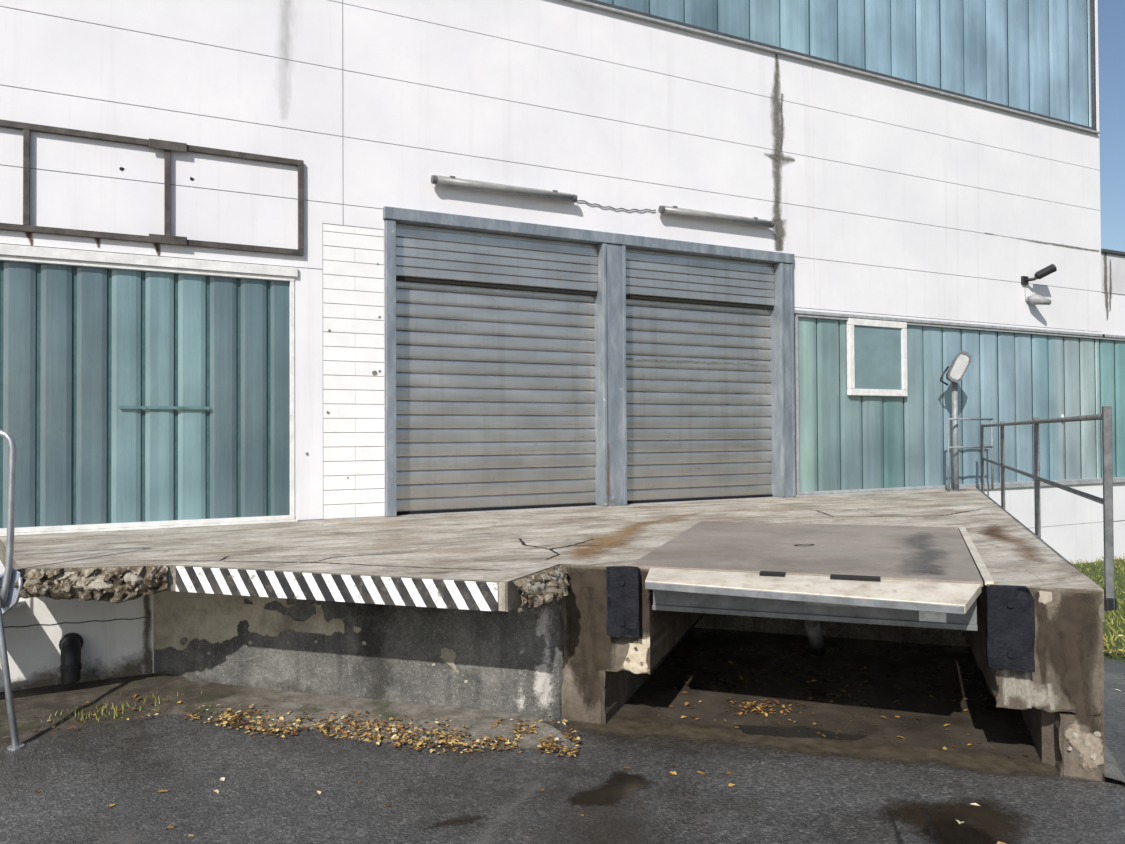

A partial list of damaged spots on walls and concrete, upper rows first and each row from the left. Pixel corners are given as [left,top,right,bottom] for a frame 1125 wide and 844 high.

flaking render [13,566,366,655]
leakage [358,604,388,699]
leakage [516,607,554,710]
spalling [512,565,569,613]
leakage [566,567,619,706]
spalling [623,637,650,674]
leakage [641,571,650,633]
leakage [1003,592,1100,732]
spalling [1065,720,1104,770]